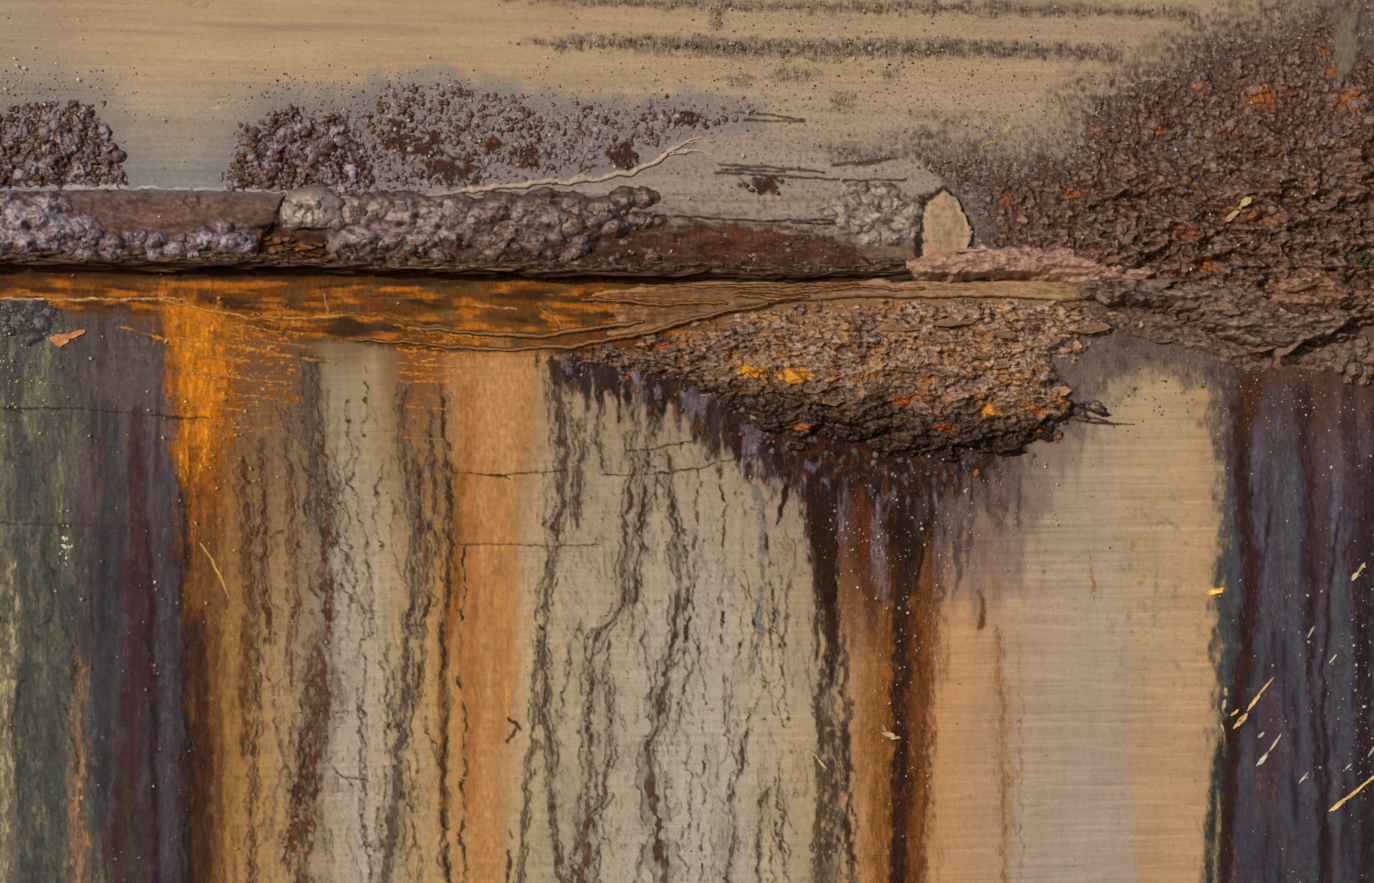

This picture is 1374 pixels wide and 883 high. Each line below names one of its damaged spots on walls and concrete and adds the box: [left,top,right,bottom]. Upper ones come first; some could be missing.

corrosion [382,119,550,188]
corrosion [517,0,1374,359]
leakage [0,306,346,883]
crack [238,366,643,883]
corrosion [0,216,1144,883]
crack [602,440,858,862]
crack [765,765,790,882]
leakage [1050,331,1374,883]